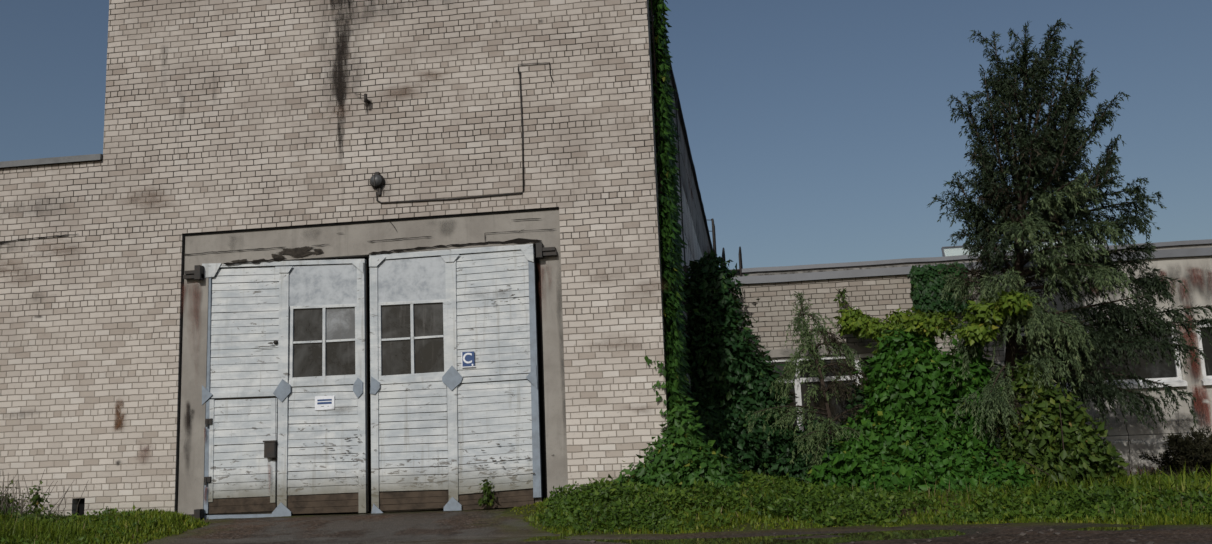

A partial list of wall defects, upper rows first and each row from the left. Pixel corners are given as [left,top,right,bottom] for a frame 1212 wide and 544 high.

leakage [330,0,351,108]
spalling [232,246,323,263]
corrosion [1179,306,1211,425]